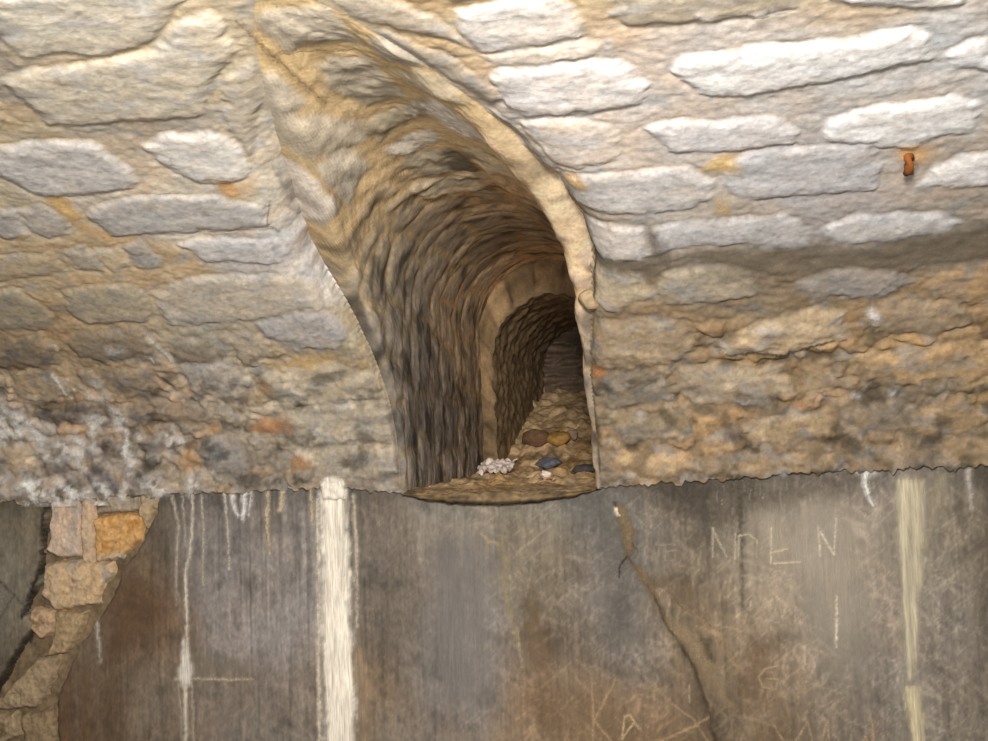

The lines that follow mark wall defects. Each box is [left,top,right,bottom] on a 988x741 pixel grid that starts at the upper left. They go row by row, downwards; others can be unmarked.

crack [235,20,348,104]
corrosion [899,147,928,163]
leakage [0,408,101,465]
leakage [16,411,134,507]
crack [0,507,50,692]
spalling [0,494,161,741]
leakage [141,479,248,741]
leakage [317,477,368,741]
crack [614,505,659,600]
leakage [897,478,944,741]